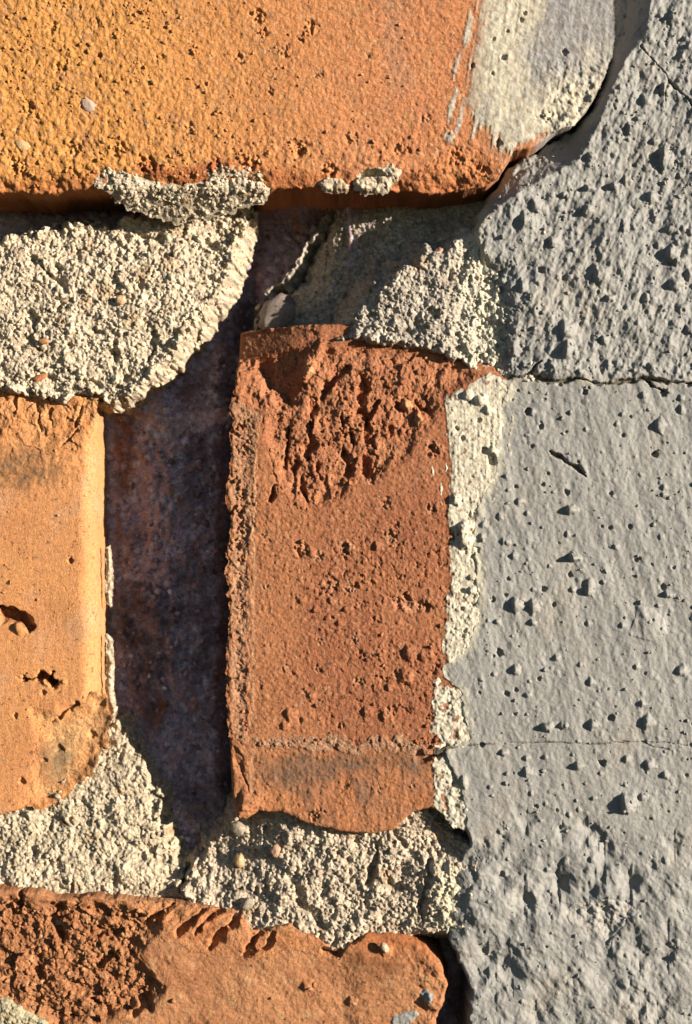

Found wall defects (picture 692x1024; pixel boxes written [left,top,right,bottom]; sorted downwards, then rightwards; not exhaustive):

peeling [413,0,615,192]
spalling [133,157,311,189]
crack [507,360,692,391]
spalling [0,391,99,479]
spalling [224,341,517,745]
spalling [0,605,36,631]
spalling [23,671,59,687]
spalling [27,690,113,811]
peeling [429,678,473,834]
crack [252,734,690,756]
spalling [0,892,334,1024]
peeling [564,899,639,941]